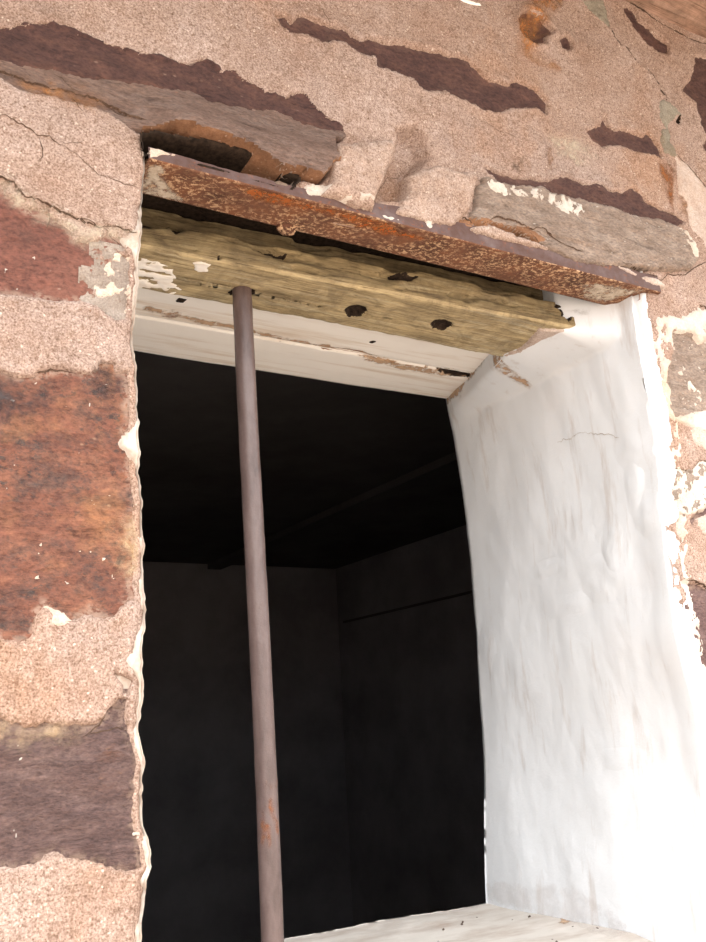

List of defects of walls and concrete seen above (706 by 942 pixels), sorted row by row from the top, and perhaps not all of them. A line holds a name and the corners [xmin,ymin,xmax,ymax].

crack [2,114,136,187]
crack [0,175,137,247]
corrosion [238,186,423,240]
spalling [485,168,685,226]
spalling [0,186,136,320]
spalling [666,332,706,417]
spalling [684,584,706,667]